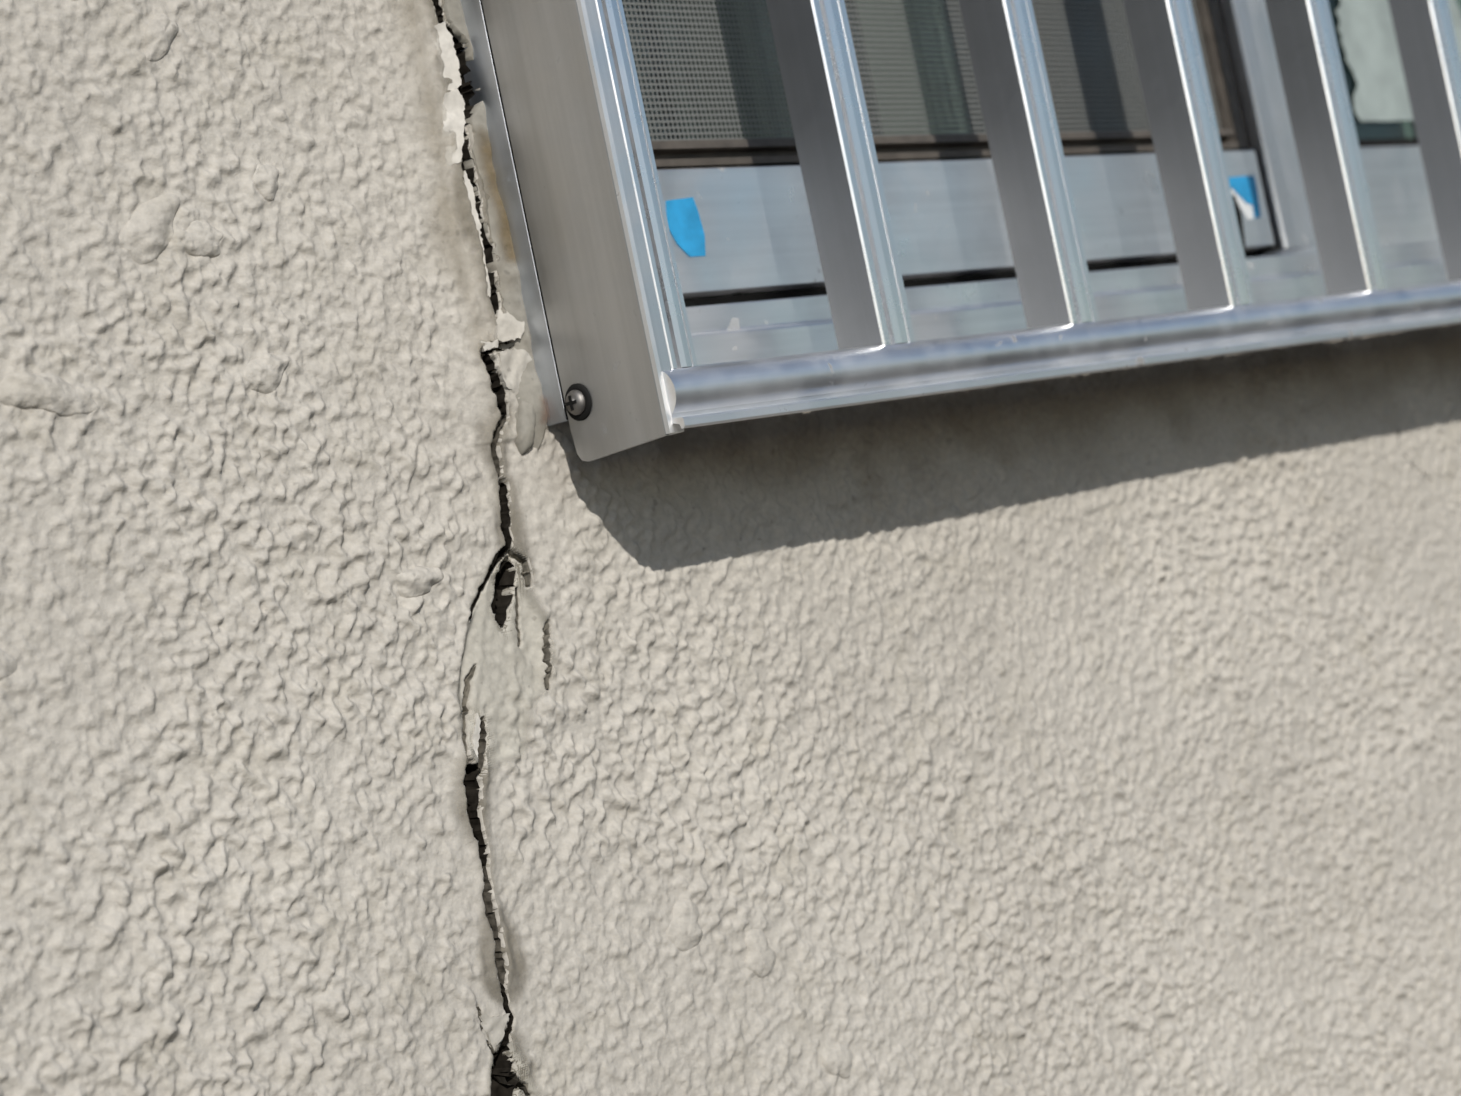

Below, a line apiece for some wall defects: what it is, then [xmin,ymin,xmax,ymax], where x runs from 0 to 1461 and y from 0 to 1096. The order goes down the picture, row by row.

peeling [434,21,532,392]
crack [430,0,553,689]
spalling [458,551,553,769]
crack [461,666,530,1096]
peeling [479,1011,538,1096]